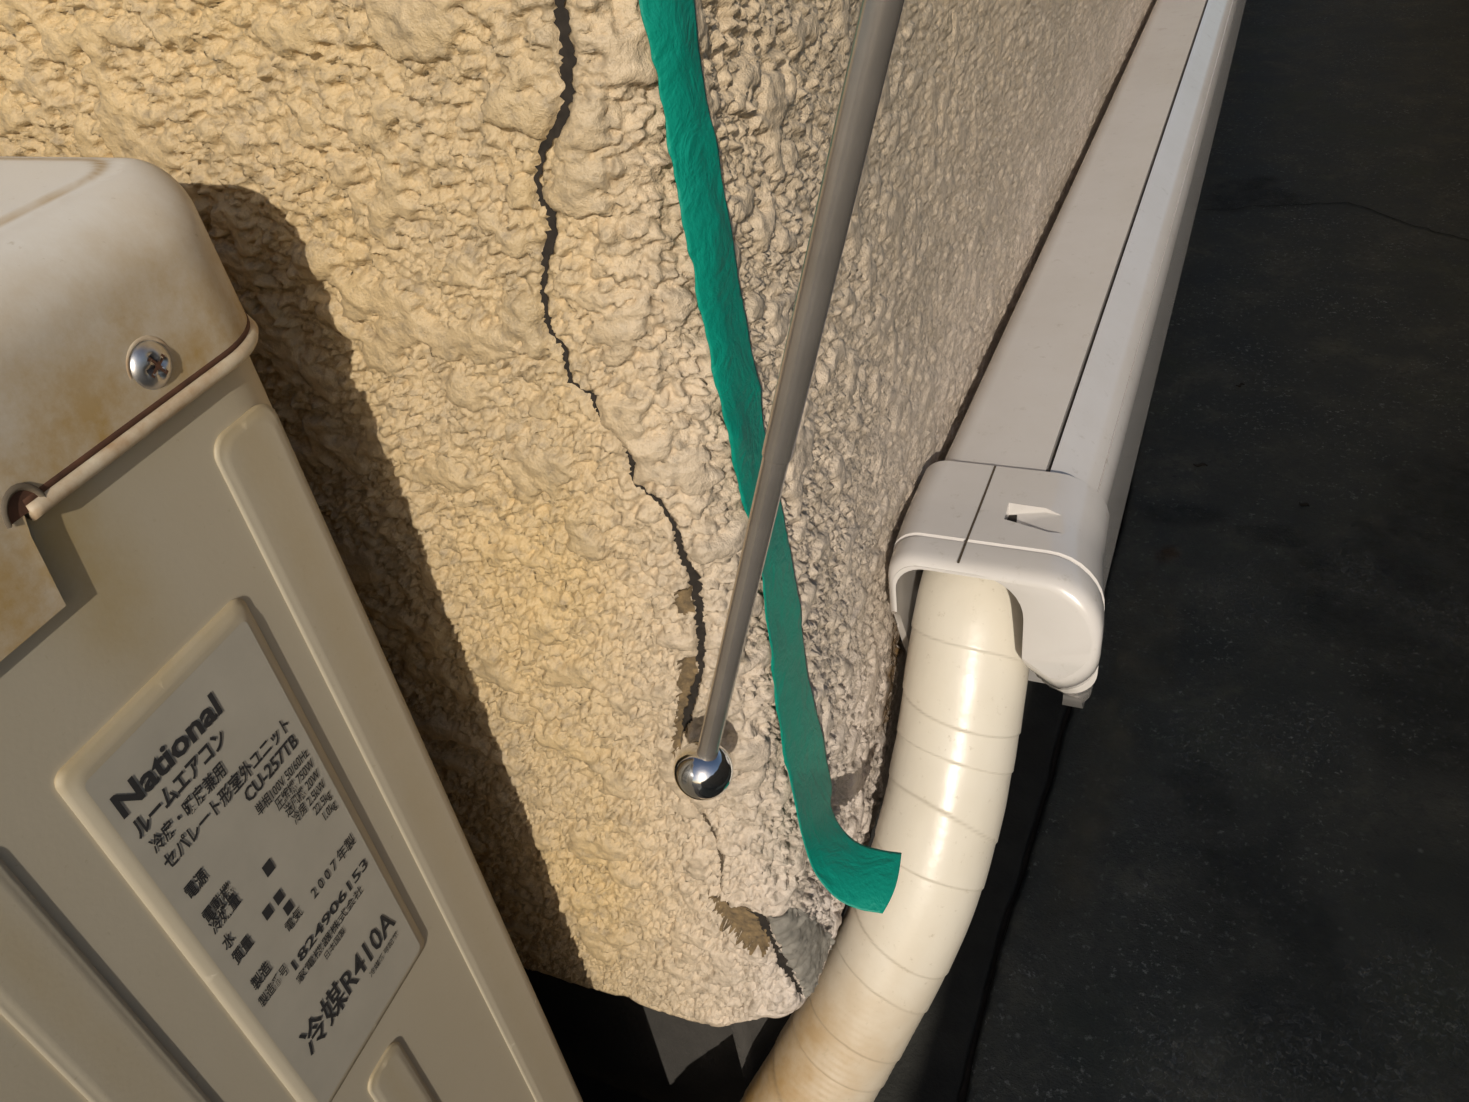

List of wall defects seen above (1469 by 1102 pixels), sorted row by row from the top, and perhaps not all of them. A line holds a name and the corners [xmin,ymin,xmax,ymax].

crack [533,0,707,750]
crack [701,813,803,995]